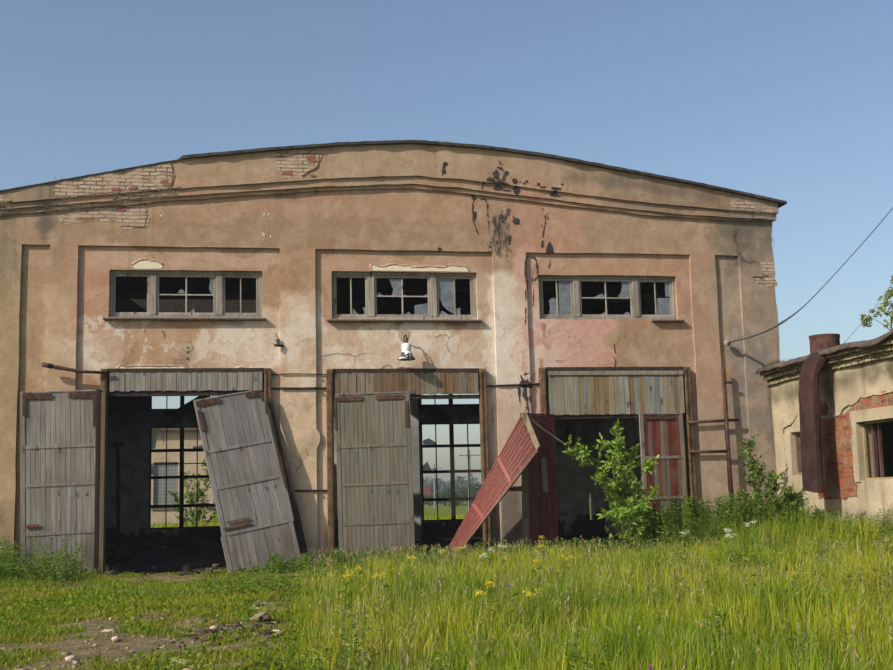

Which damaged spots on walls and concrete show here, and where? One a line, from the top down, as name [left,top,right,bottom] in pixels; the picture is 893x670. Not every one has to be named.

spalling [276,149,322,178]
spalling [44,162,180,229]
leakage [488,208,511,257]
peeling [370,263,470,272]
spalling [753,262,778,287]
peeling [116,343,193,368]
spalling [818,390,893,500]